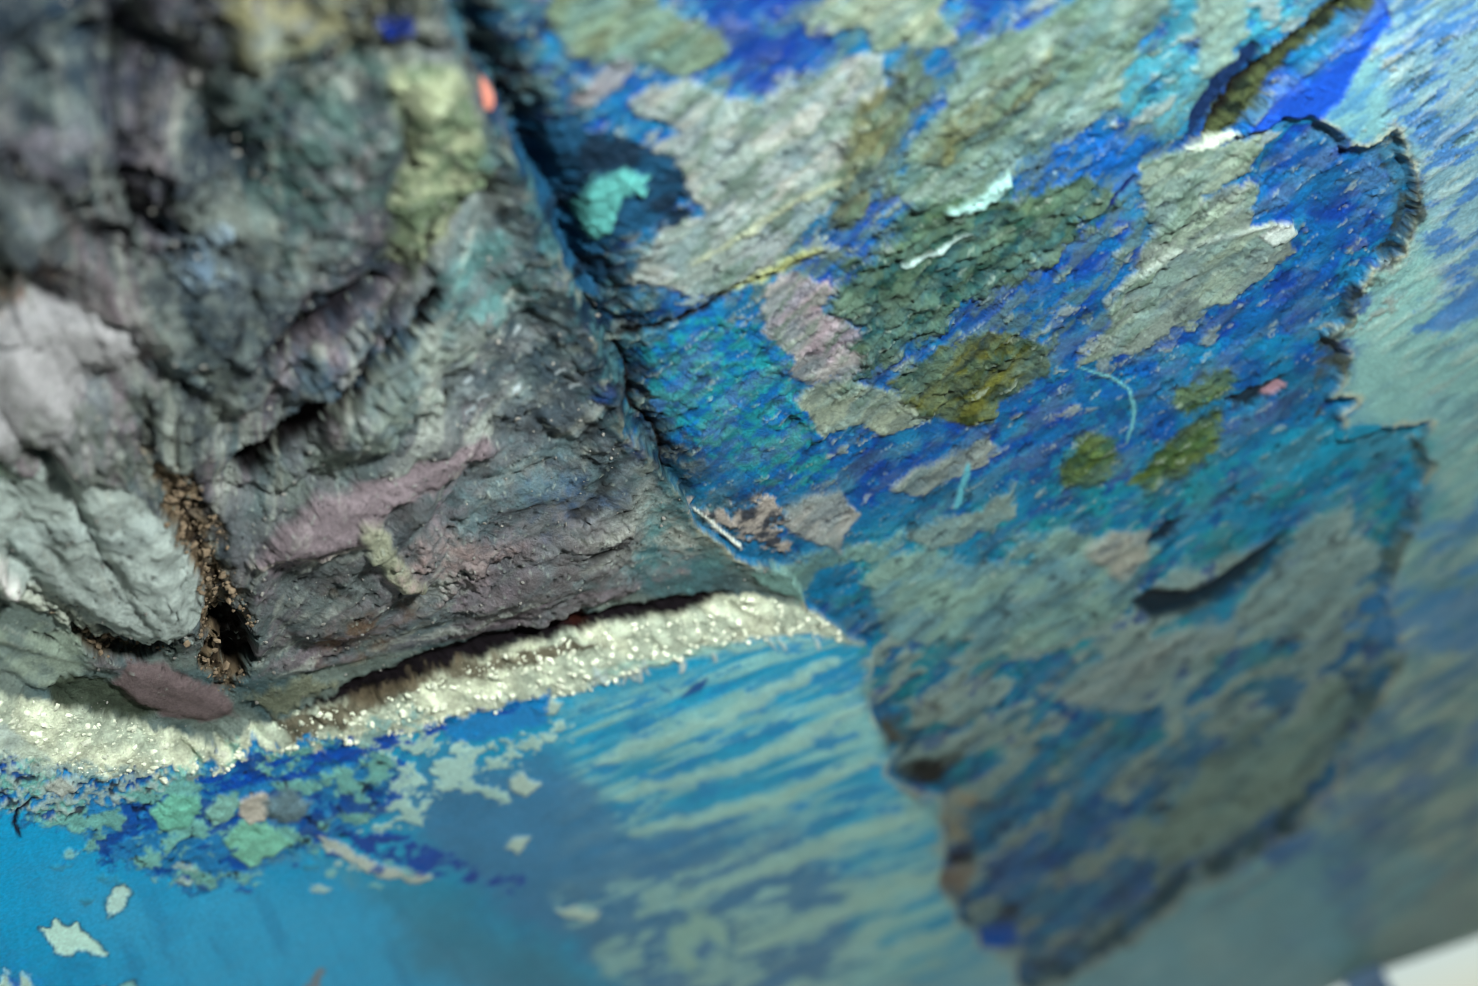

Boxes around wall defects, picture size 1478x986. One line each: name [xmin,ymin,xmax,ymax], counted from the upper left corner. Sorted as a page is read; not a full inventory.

peeling [1085,0,1211,165]
crack [1187,0,1380,152]
peeling [1203,0,1364,201]
spalling [0,0,1078,898]
peeling [595,129,1478,986]
peeling [43,919,110,958]
peeling [107,886,132,916]
peeling [558,907,603,921]